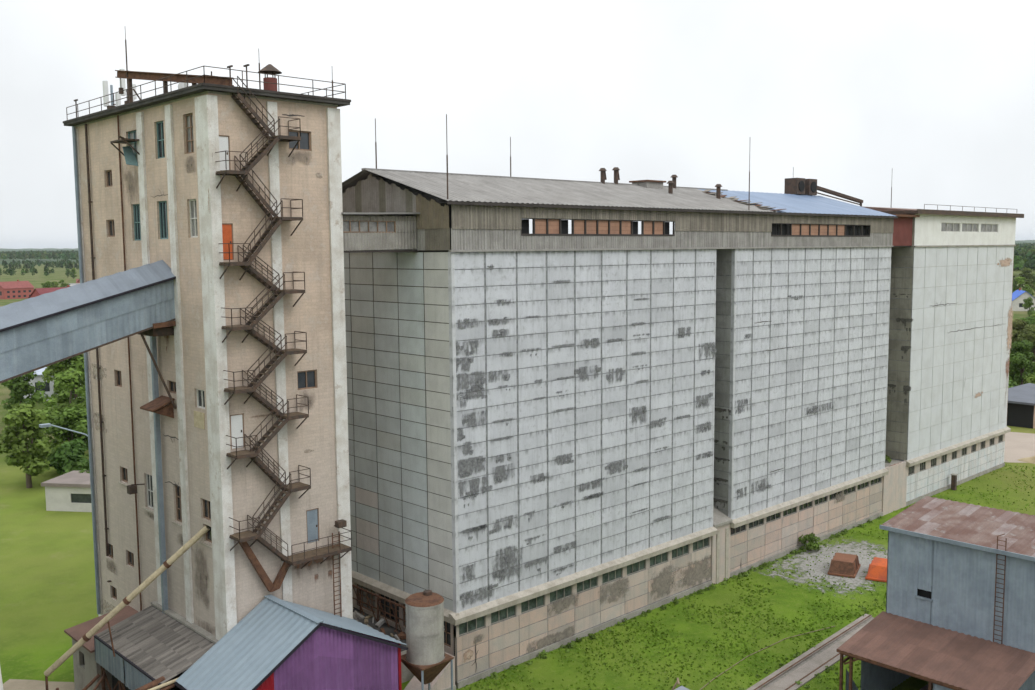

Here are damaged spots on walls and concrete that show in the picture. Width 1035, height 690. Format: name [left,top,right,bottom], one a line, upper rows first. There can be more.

damp [651,555,711,597]